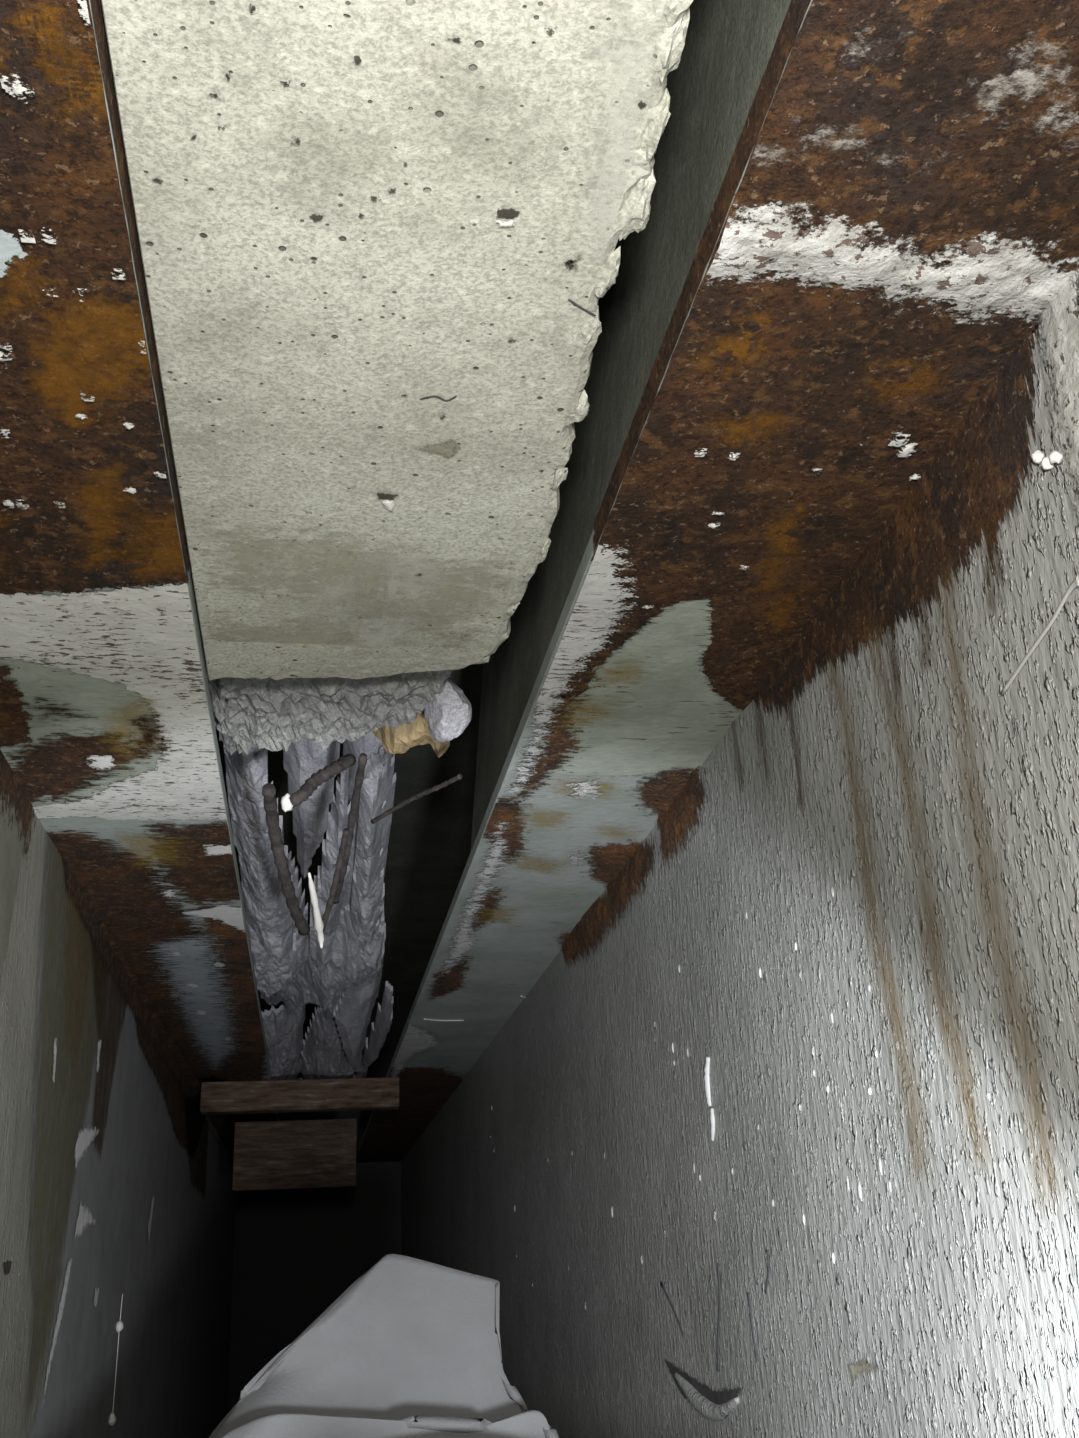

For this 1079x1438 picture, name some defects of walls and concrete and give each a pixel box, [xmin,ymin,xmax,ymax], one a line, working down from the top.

corrosion [0,0,190,598]
corrosion [562,0,1079,810]
corrosion [62,857,278,1196]
peeling [0,583,463,1084]
corrosion [553,765,708,967]